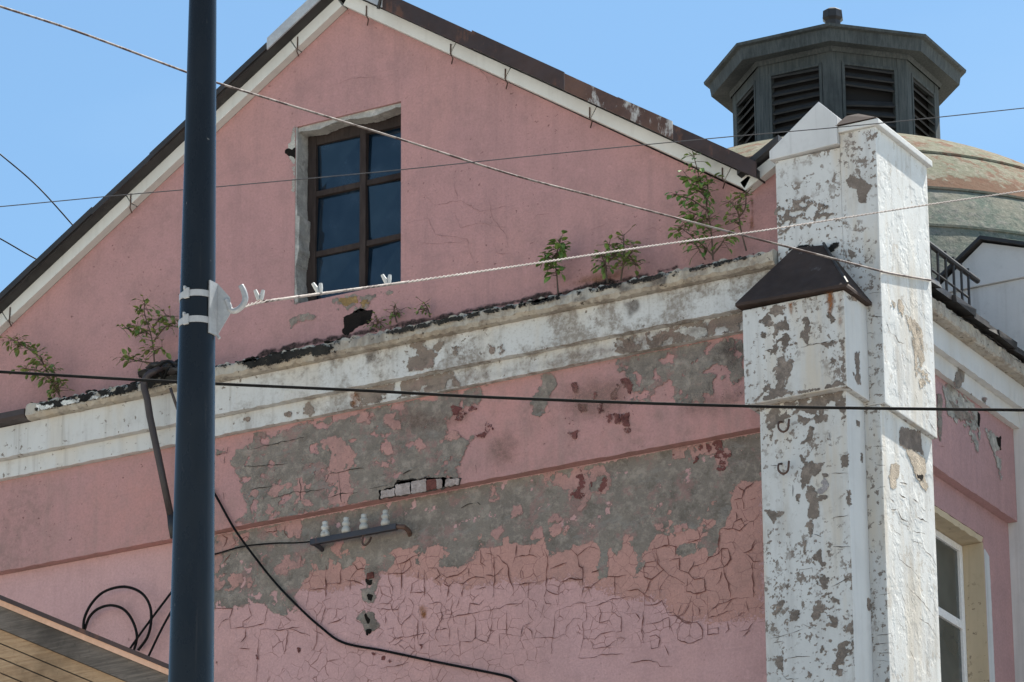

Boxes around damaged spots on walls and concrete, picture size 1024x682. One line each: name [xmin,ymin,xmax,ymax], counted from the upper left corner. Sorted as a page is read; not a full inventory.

peeling [774,198,837,235]
peeling [846,174,872,203]
spalling [332,289,393,335]
peeling [891,299,1003,480]
crack [218,437,428,500]
flaking render [214,300,863,676]
flaking render [889,427,928,491]
crack [215,483,813,677]